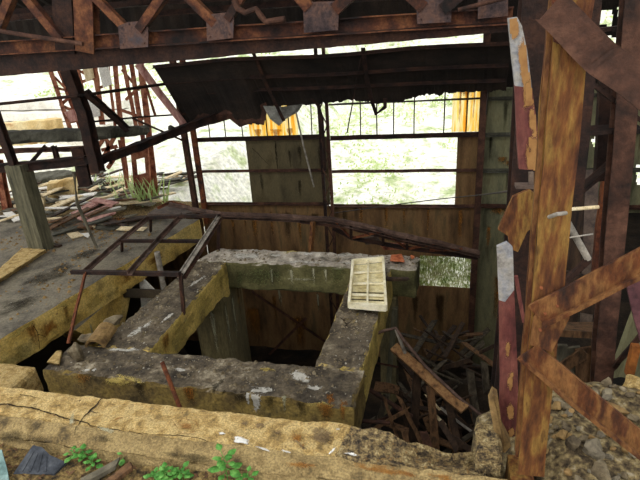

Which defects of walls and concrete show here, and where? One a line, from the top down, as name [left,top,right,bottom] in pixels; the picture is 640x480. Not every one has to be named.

peeling [510,18,537,171]
crack [0,394,209,442]
water stain [240,387,273,410]
water stain [293,370,322,390]